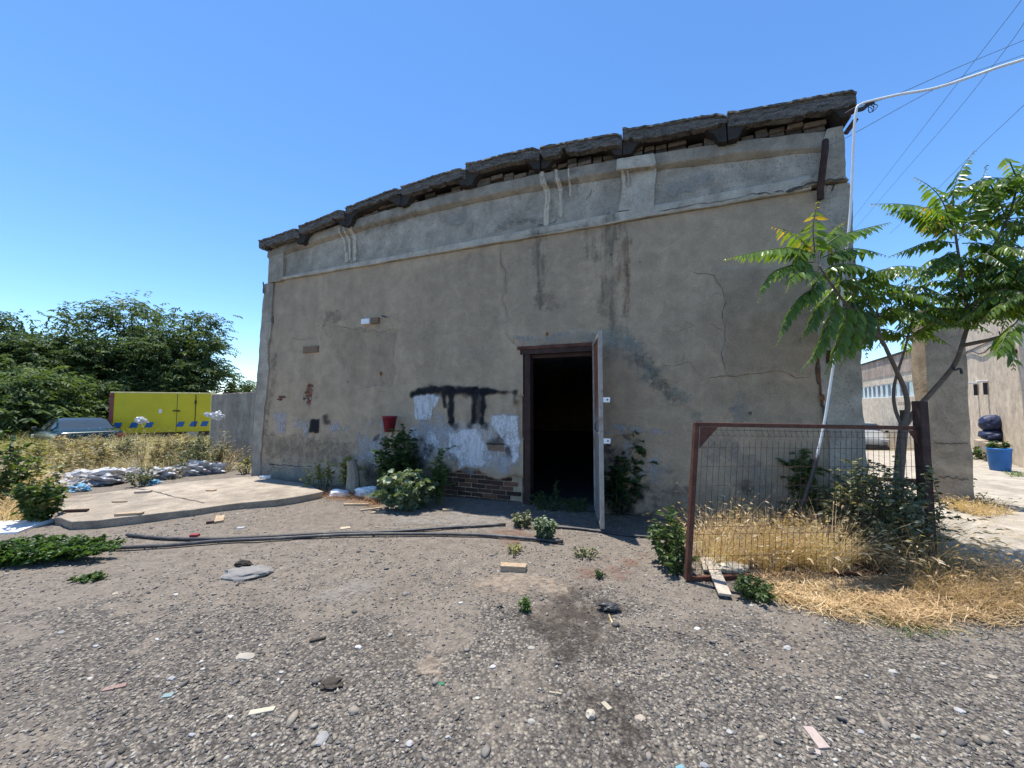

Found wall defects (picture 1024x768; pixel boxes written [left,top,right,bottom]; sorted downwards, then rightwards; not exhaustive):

crack [664,271,825,419]
flaking render [443,468,521,503]